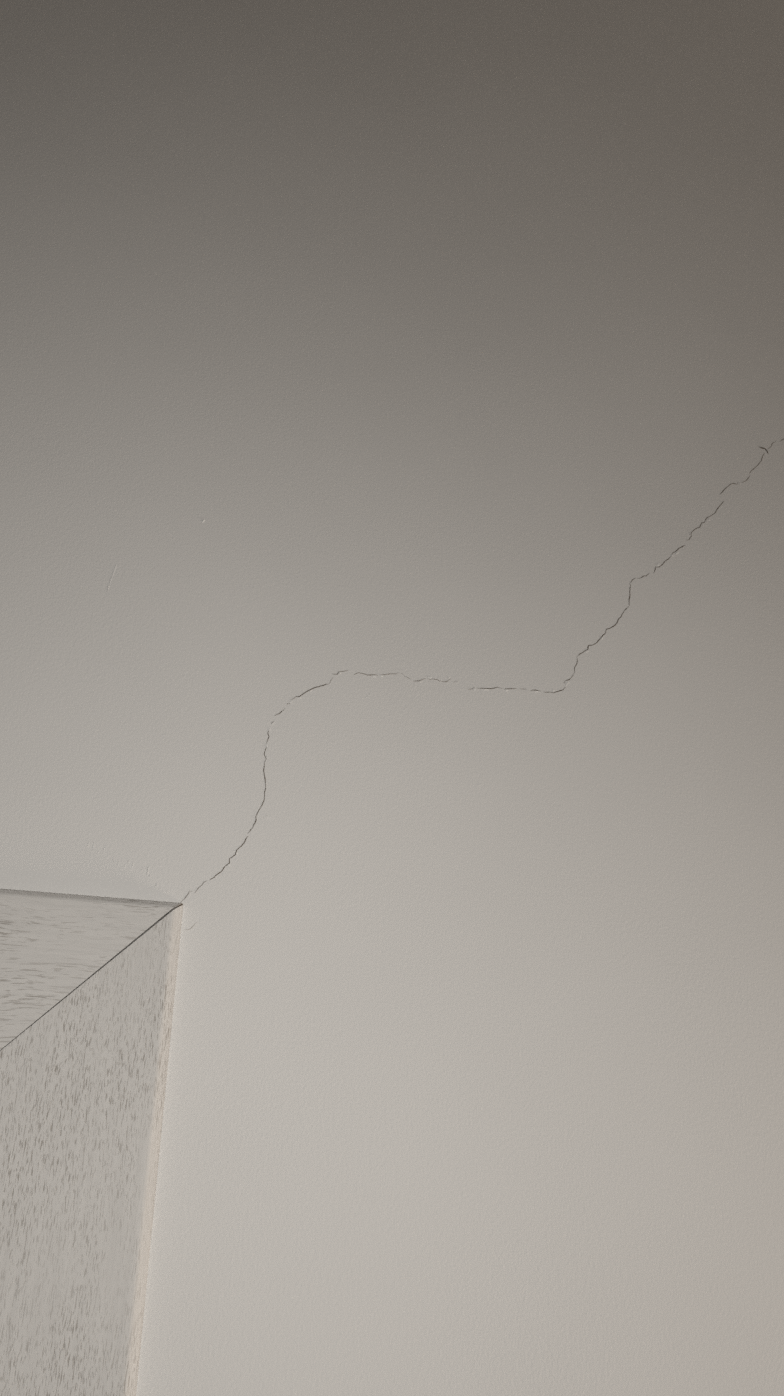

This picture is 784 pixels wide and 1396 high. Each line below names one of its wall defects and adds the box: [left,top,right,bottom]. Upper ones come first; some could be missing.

crack [181,439,784,930]